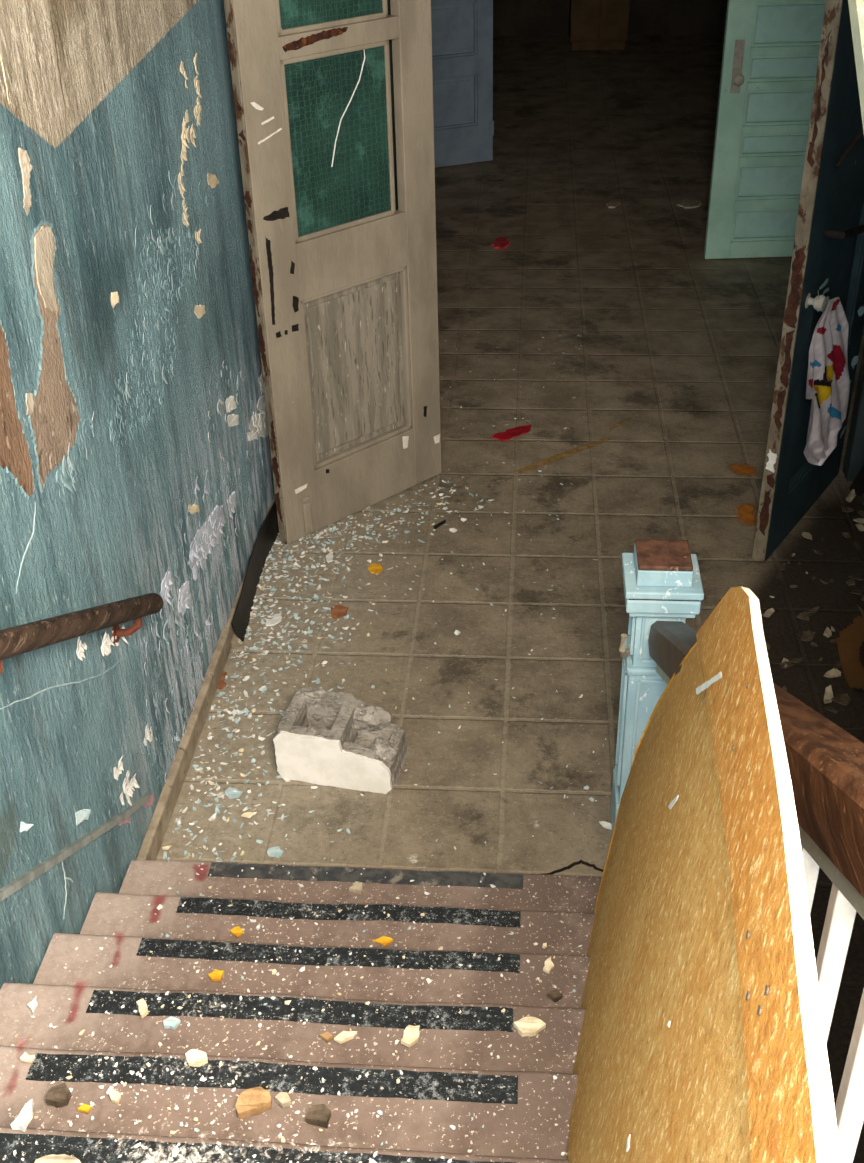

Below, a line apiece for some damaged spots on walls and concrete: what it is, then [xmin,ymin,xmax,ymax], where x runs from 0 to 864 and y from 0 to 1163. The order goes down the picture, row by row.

peeling [178,53,202,244]
corrosion [807,31,831,168]
corrosion [244,191,267,376]
corrosion [775,247,806,430]